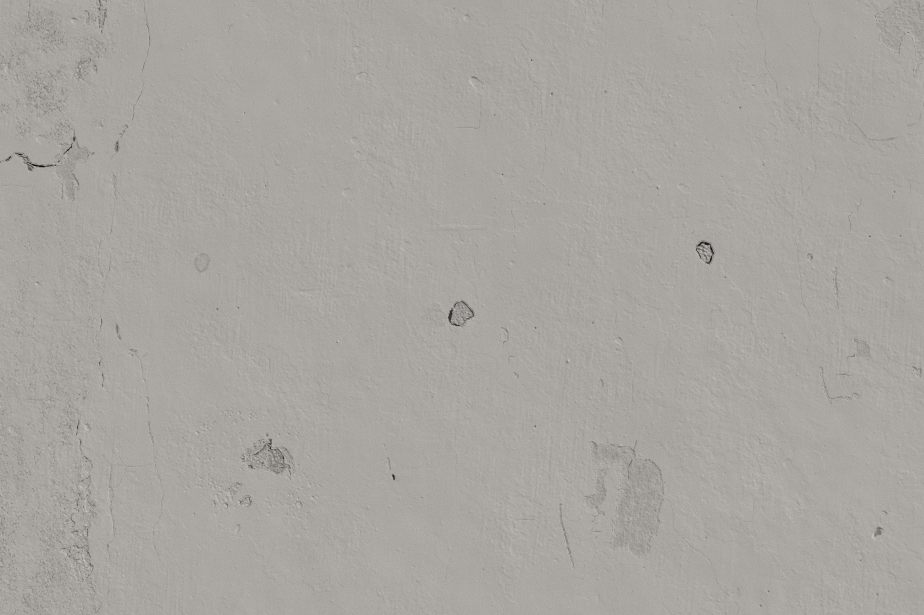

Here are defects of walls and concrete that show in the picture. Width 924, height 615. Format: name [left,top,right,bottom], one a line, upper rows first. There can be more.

crack [0,8,150,191]
spalling [695,241,715,265]
spalling [447,300,475,328]
crack [92,241,164,554]
spalling [239,433,295,480]
peeling [583,440,665,560]